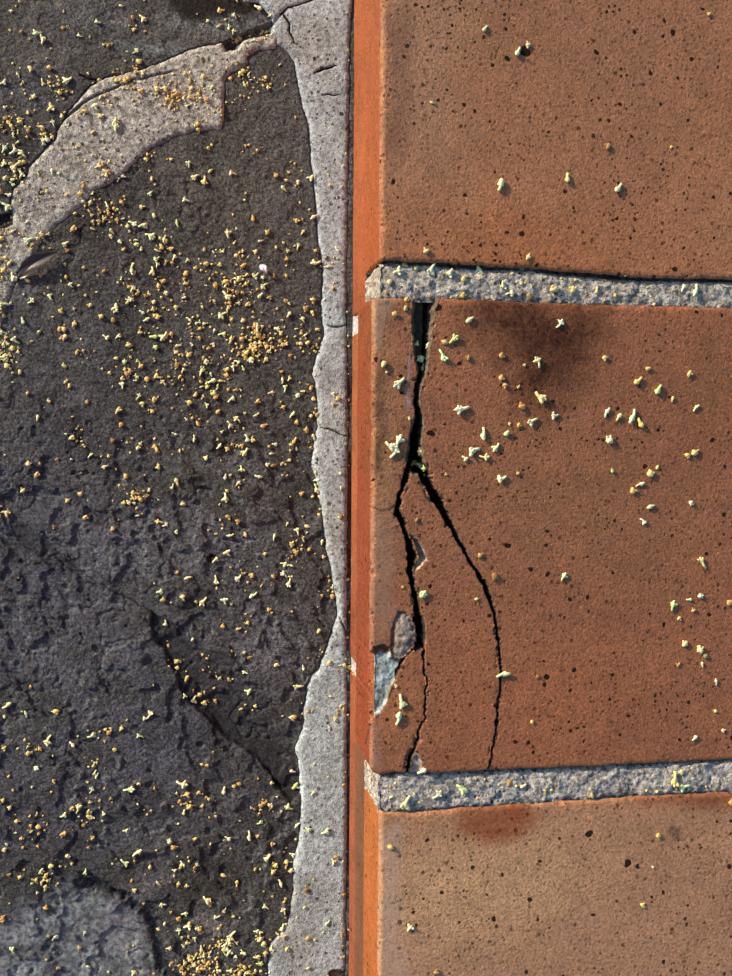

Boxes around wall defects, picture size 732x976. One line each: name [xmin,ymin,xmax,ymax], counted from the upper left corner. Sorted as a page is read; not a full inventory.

damp [171,0,253,20]
crack [280,0,312,44]
damp [483,301,588,392]
crack [393,298,503,773]
spalling [372,611,426,718]